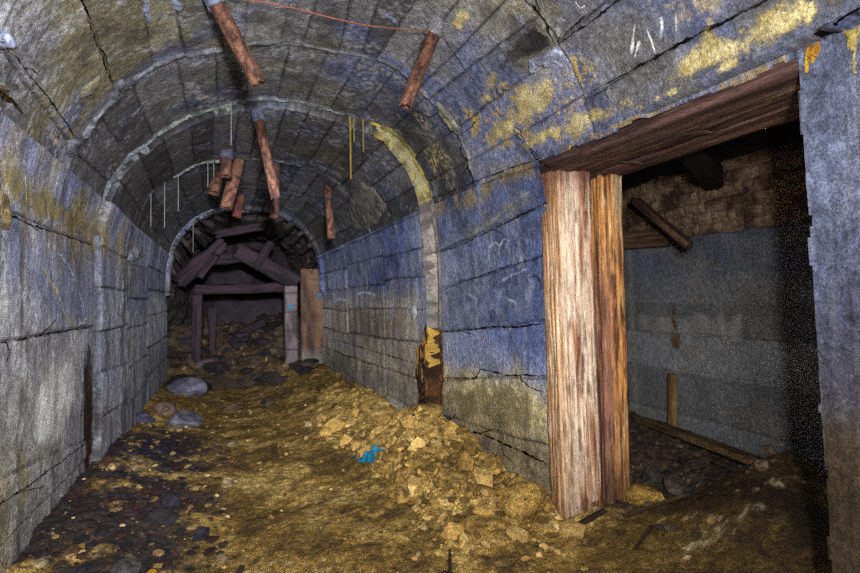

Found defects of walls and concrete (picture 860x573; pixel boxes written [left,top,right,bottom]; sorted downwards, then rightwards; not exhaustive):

peeling [0,29,19,49]
leakage [452,10,469,30]
leakage [679,0,818,76]
leakage [804,41,821,73]
leakage [843,25,860,74]
leakage [489,79,553,145]
leakage [525,109,609,147]
leakage [372,122,442,331]